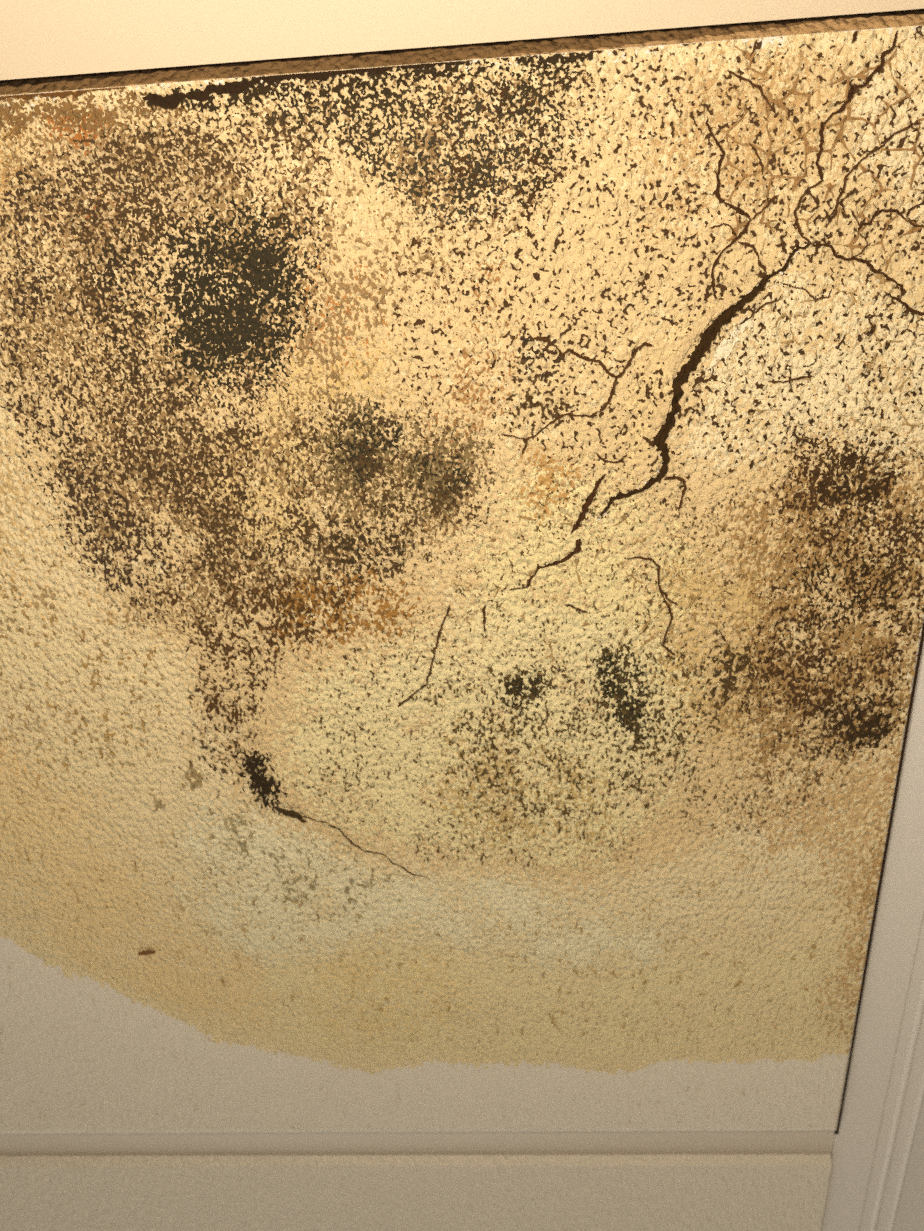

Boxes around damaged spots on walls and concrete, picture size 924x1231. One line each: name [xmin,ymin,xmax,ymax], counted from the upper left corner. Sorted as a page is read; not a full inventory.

crack [397,30,924,707]
damp [681,315,719,364]
crack [303,816,427,878]